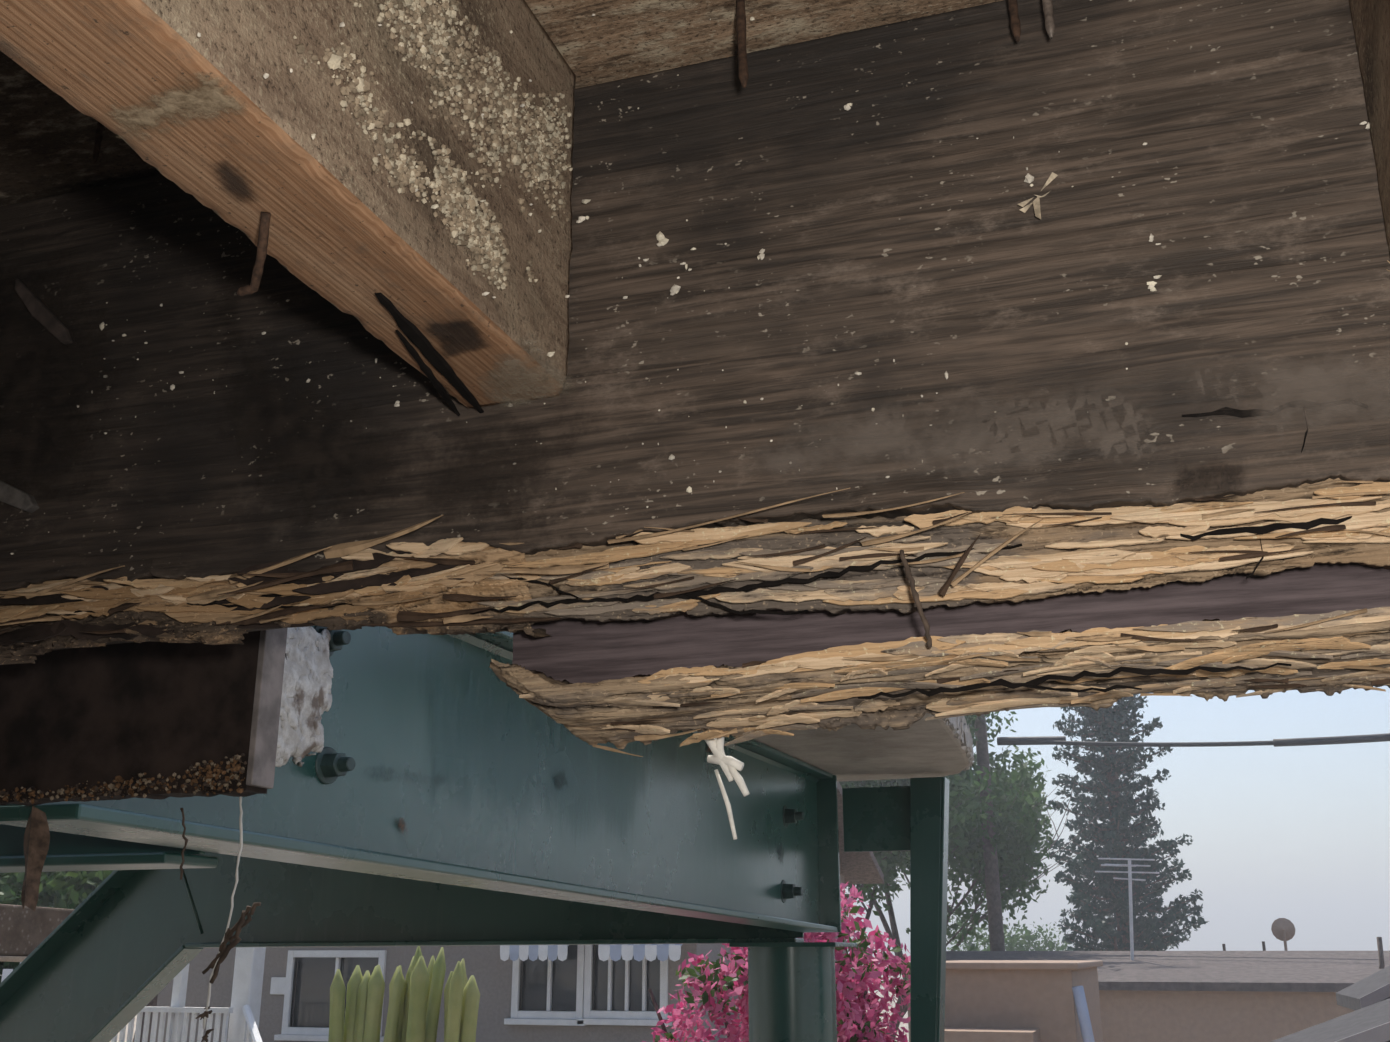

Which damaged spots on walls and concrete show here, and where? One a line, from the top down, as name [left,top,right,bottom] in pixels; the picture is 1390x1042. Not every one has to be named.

peeling [0,482,1390,771]